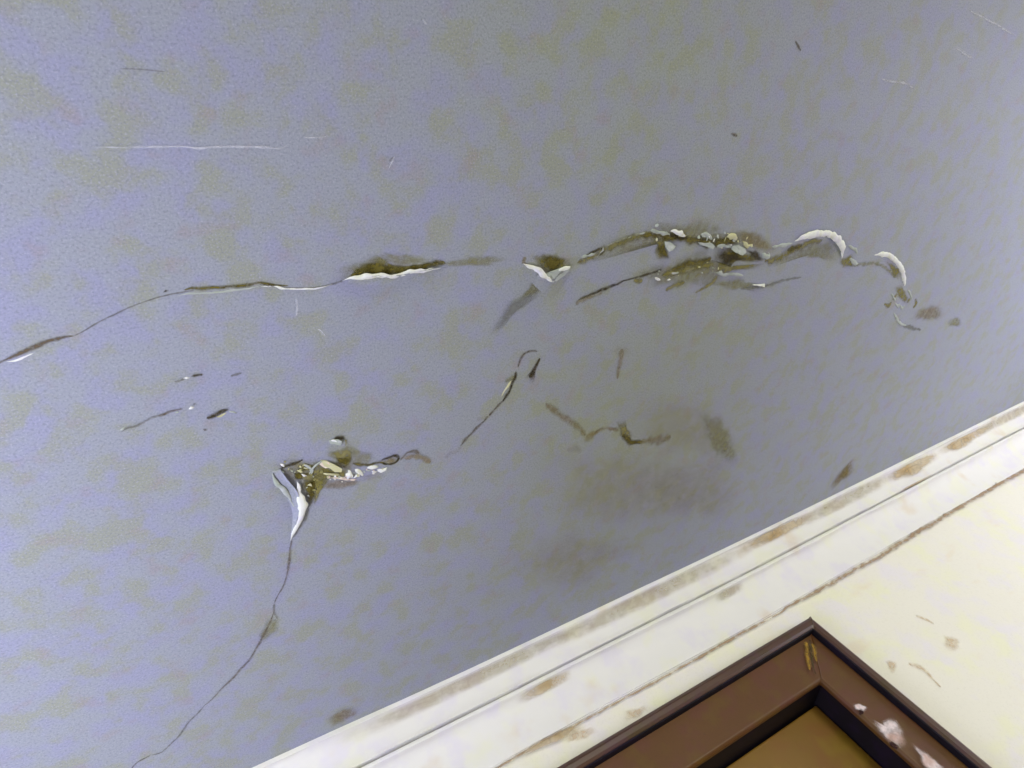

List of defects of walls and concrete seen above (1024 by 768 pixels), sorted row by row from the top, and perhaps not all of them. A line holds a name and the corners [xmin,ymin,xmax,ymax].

crack [0,256,489,363]
peeling [502,223,921,331]
crack [120,406,206,431]
crack [462,350,540,444]
spalling [271,436,431,539]
crack [132,541,292,768]
peeling [879,721,902,749]
peeling [917,749,941,768]